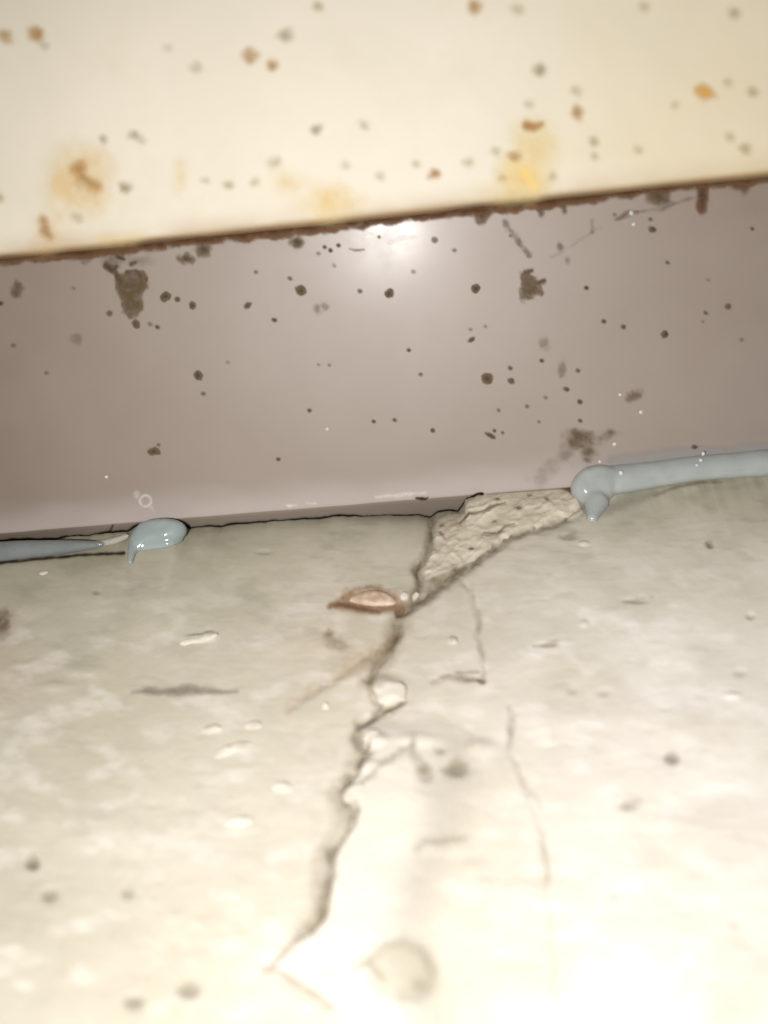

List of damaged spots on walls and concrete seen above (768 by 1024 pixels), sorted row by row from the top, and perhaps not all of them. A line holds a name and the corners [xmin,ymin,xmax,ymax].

rust [522,121,543,131]
rust [0,154,768,265]
crack [0,524,139,564]
crack [180,493,483,537]
spalling [420,489,585,580]
crack [411,558,481,607]
crack [461,676,485,684]
crack [360,702,405,727]
crack [299,882,330,941]